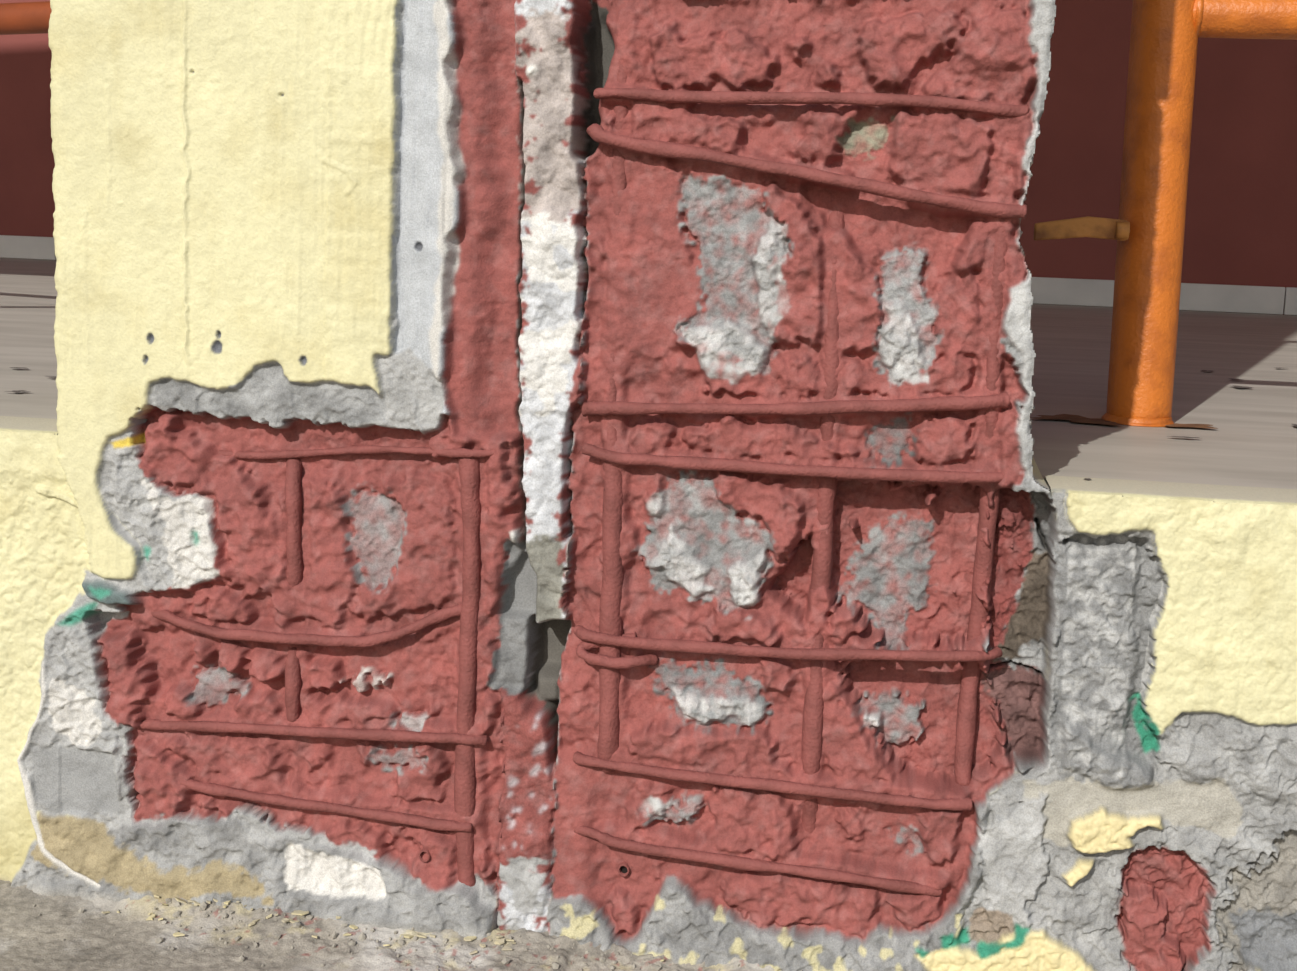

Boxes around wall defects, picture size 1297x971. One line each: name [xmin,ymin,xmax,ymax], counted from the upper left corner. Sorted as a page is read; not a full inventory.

spalling [10,0,527,940]
spalling [547,0,1297,971]